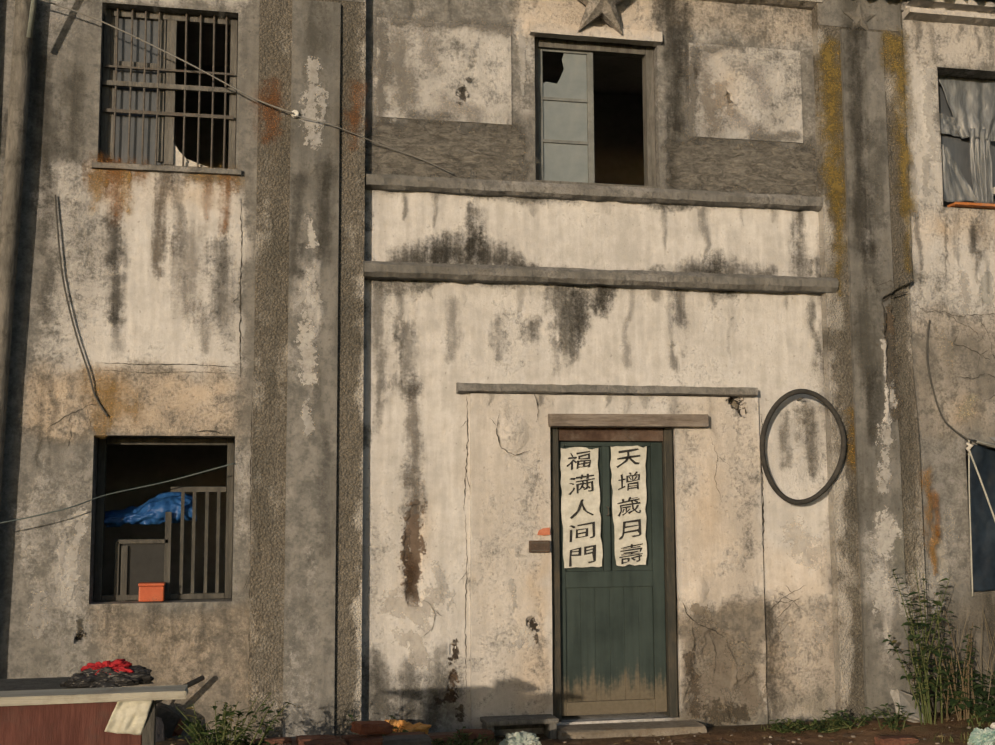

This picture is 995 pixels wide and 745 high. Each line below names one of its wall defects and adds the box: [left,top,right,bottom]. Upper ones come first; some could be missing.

peeling [298,56,329,150]
damp [103,215,121,322]
damp [152,165,173,275]
rust [223,175,231,231]
damp [391,204,535,267]
damp [546,285,582,356]
crack [871,279,995,398]
spalling [876,303,905,494]
spalling [398,481,427,610]
crack [462,398,528,694]
peeling [865,506,916,618]
spalling [435,638,464,722]